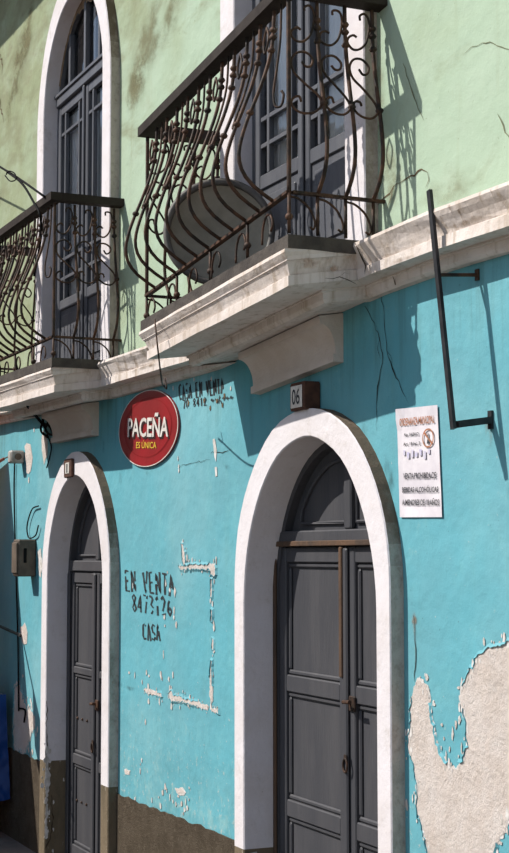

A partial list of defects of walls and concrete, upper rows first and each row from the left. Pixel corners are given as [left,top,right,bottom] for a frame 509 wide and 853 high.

crack [327,243,366,284]
crack [365,277,407,422]
peeling [20,623,28,645]
peeling [128,540,221,716]
peeling [12,675,38,758]
peeling [40,743,54,839]
peeling [405,633,509,853]